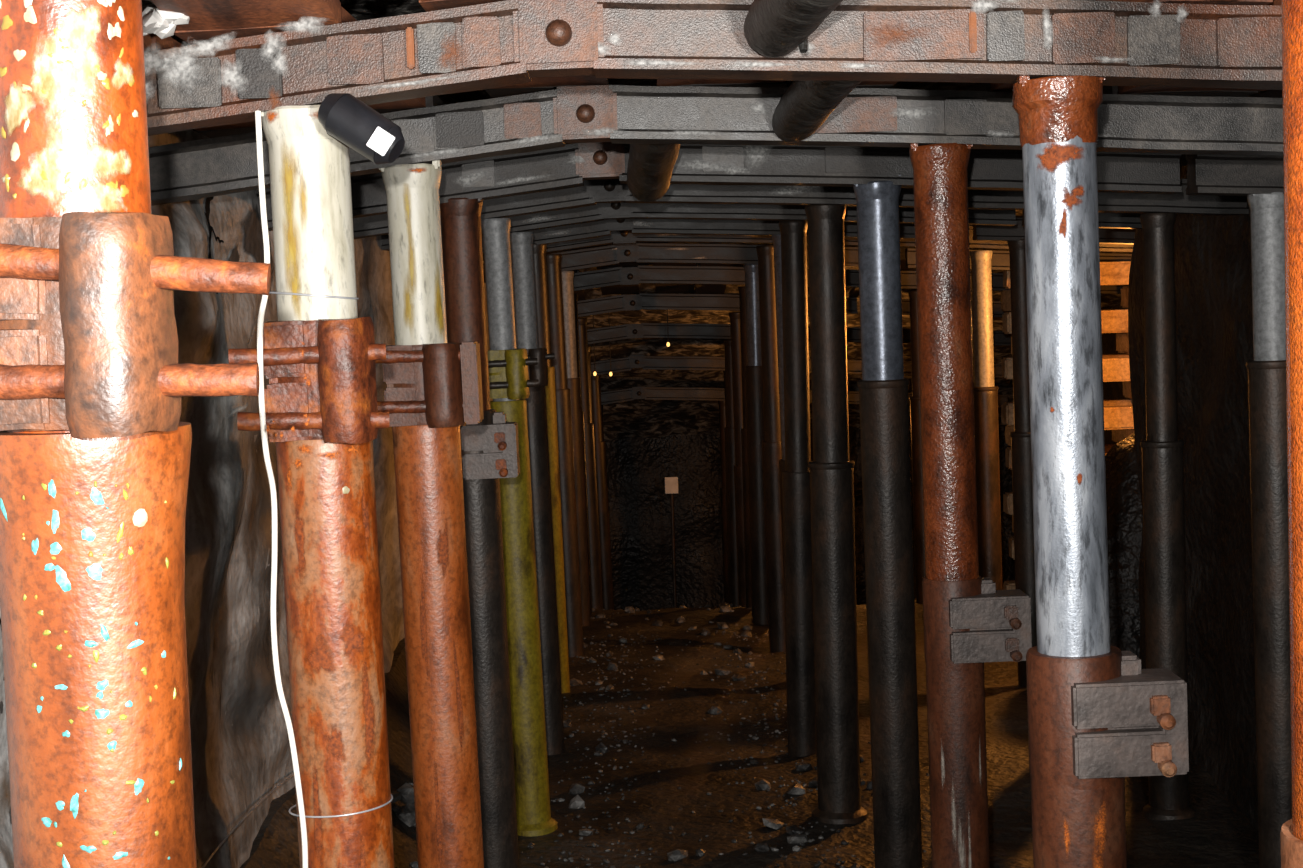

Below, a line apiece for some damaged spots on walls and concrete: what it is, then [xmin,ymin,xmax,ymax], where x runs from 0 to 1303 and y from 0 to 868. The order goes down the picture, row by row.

peeling [0,0,138,212]
corrosion [287,445,358,489]
corrosion [294,508,305,577]
corrosion [437,523,449,575]
corrosion [309,625,375,769]
corrosion [1,779,11,806]
corrosion [313,767,323,857]
corrosion [1094,810,1105,868]